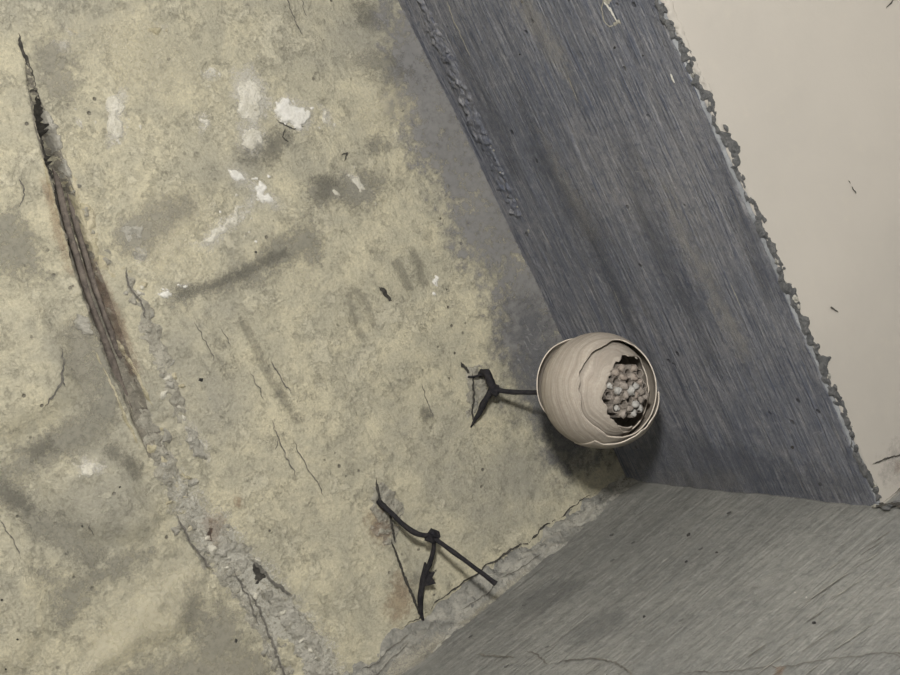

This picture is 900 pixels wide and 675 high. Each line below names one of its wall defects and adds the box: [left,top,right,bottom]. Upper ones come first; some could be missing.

peeling [235,78,336,152]
leakage [308,168,385,210]
peeling [346,166,365,192]
leakage [359,0,601,474]
crack [45,348,66,406]
flaking render [41,116,347,675]
flaking render [370,477,422,620]